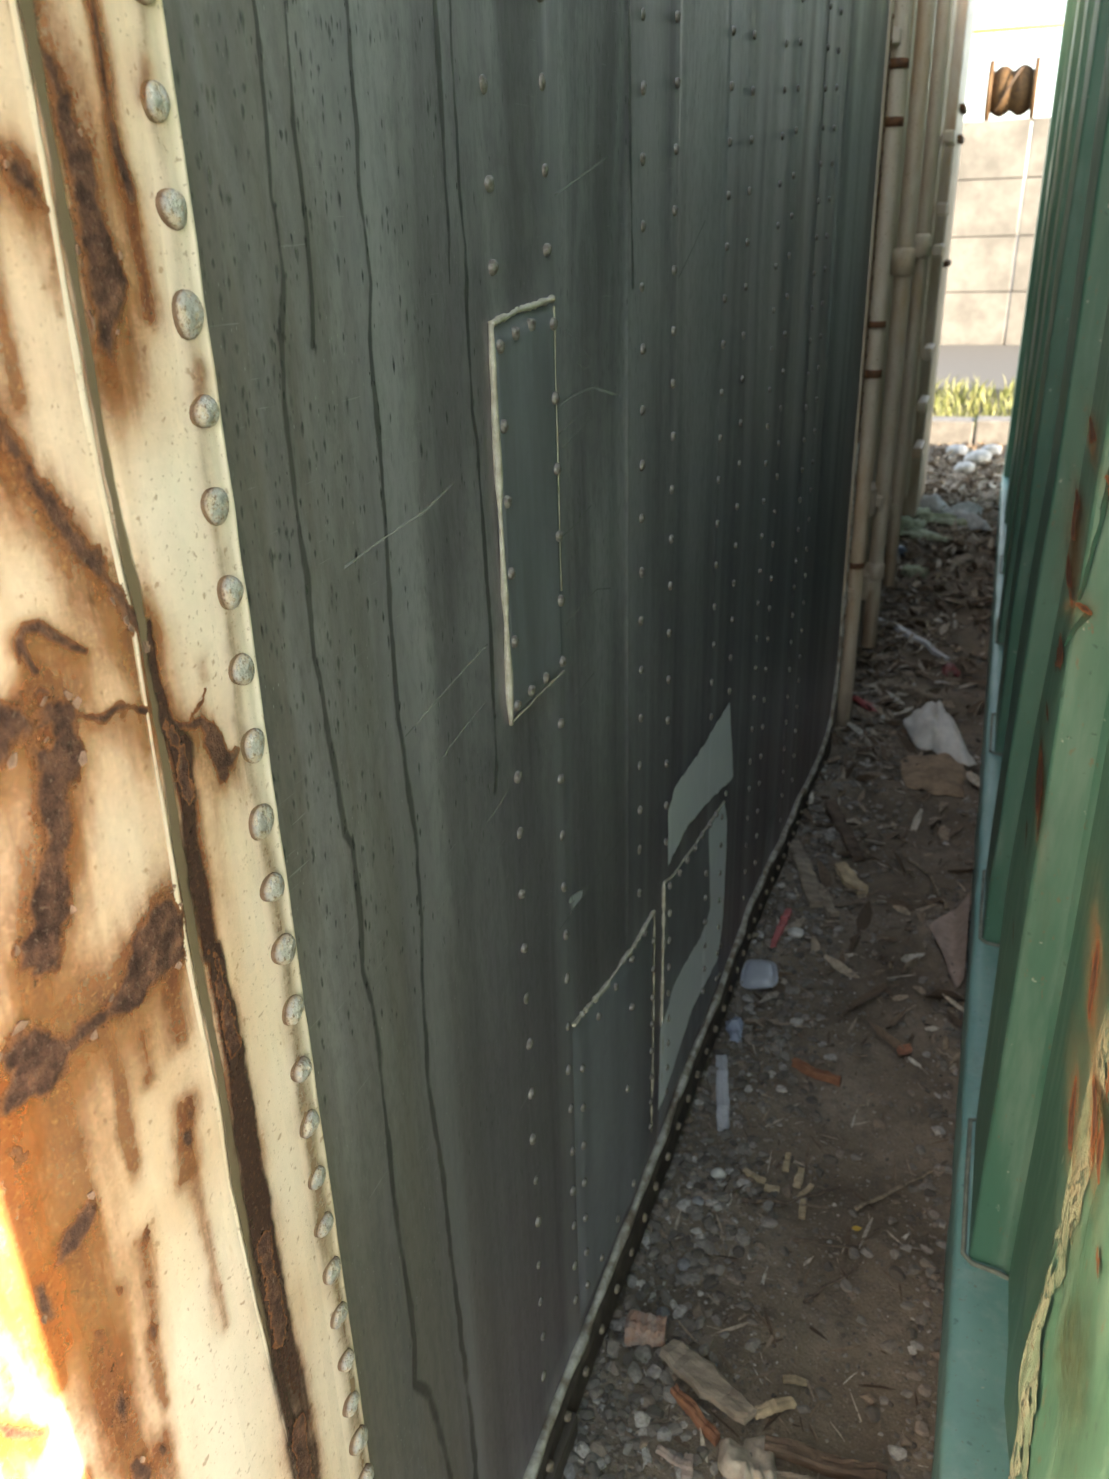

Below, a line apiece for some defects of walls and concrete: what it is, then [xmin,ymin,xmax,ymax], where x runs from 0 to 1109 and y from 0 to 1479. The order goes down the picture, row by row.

corrosion [0,137,50,225]
corrosion [33,0,157,403]
peeling [1066,488,1092,615]
corrosion [0,281,320,1479]
corrosion [298,1082,328,1259]
peeling [1008,934,1109,1479]
corrosion [334,1278,366,1473]